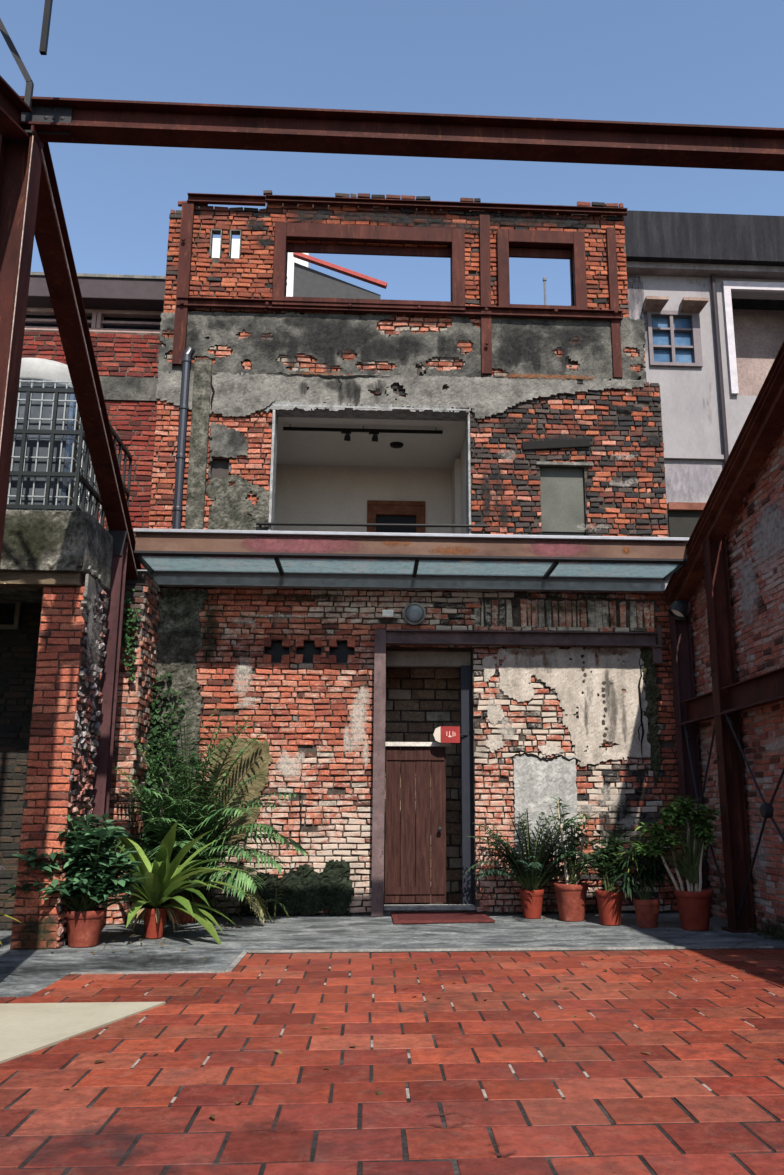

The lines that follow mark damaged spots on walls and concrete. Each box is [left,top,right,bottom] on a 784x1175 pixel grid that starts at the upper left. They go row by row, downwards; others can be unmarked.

flaking render [376,313,453,336]
flaking render [161,330,174,362]
flaking render [192,330,274,364]
flaking render [276,350,397,373]
water stain [324,347,384,404]
flaking render [416,341,473,371]
peeling [264,400,471,414]
peeling [206,422,270,531]
peeling [482,646,651,766]